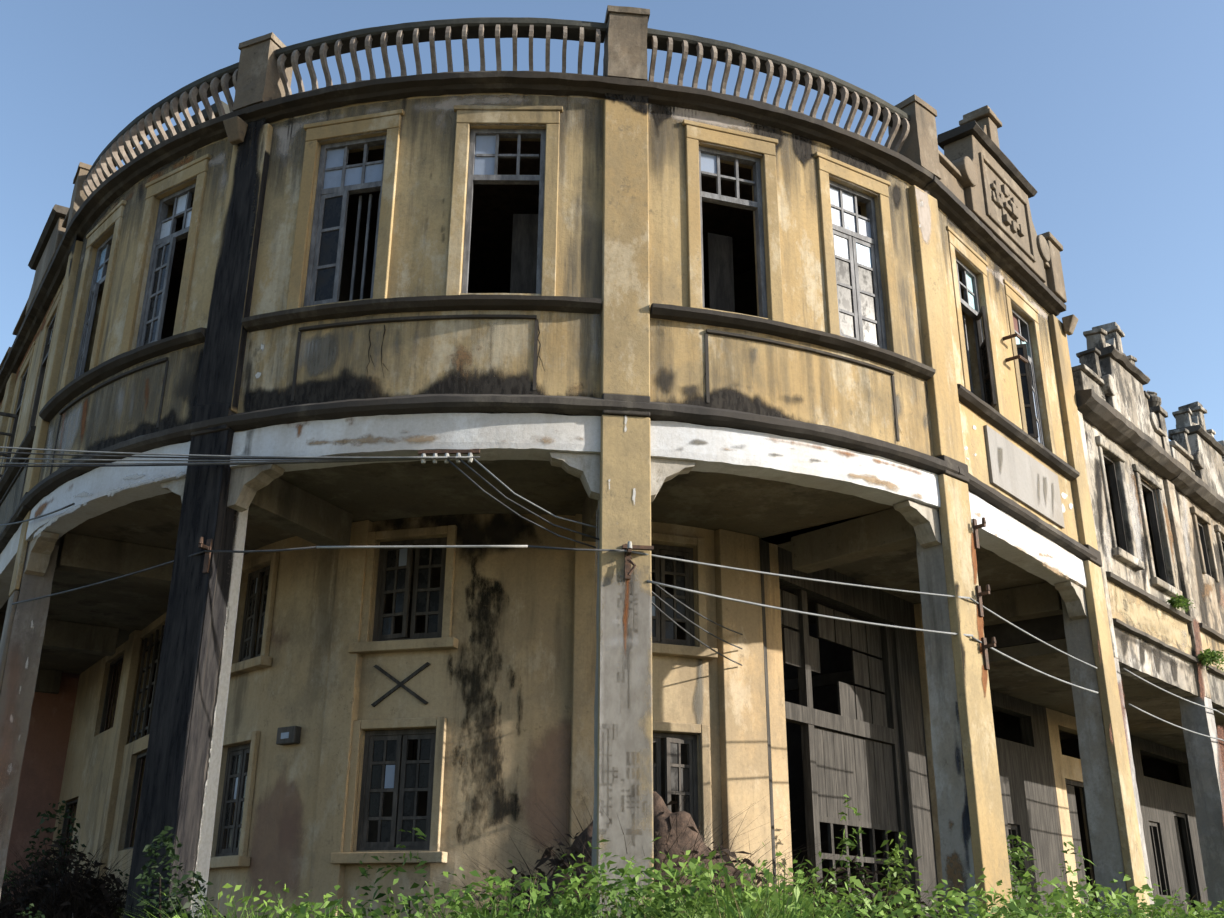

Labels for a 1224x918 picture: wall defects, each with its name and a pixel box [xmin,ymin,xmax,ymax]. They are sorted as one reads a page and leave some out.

damp [705,123,908,239]
damp [0,93,686,918]
peeling [309,435,435,445]
damp [657,370,800,420]
peeling [849,474,897,490]
damp [694,659,703,754]